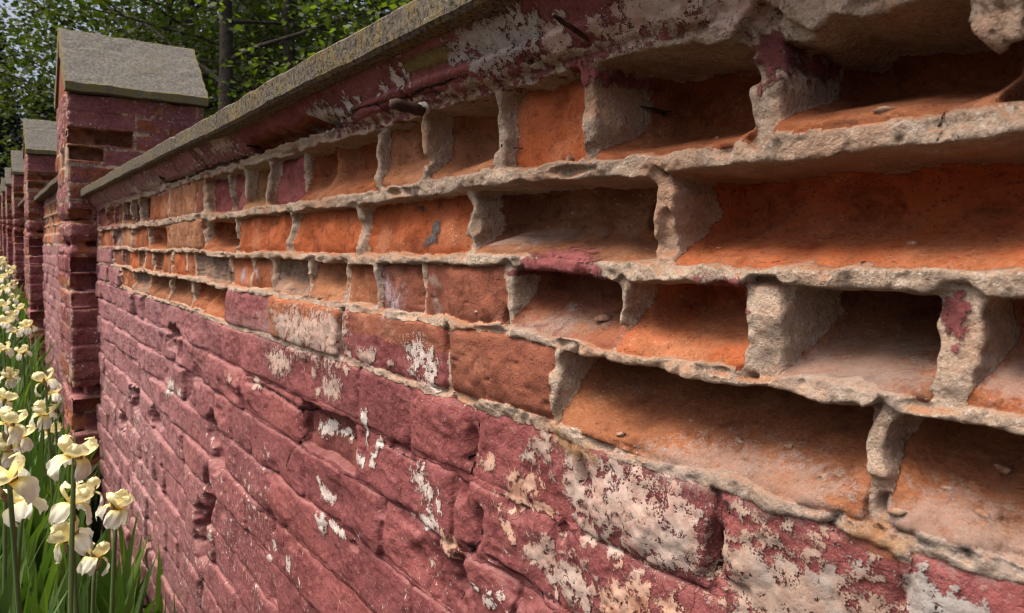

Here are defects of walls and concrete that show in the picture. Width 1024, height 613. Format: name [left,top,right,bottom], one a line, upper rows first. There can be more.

peeling [376,61,411,100]
crack [339,74,468,120]
spalling [436,0,790,168]
spalling [66,92,1024,613]